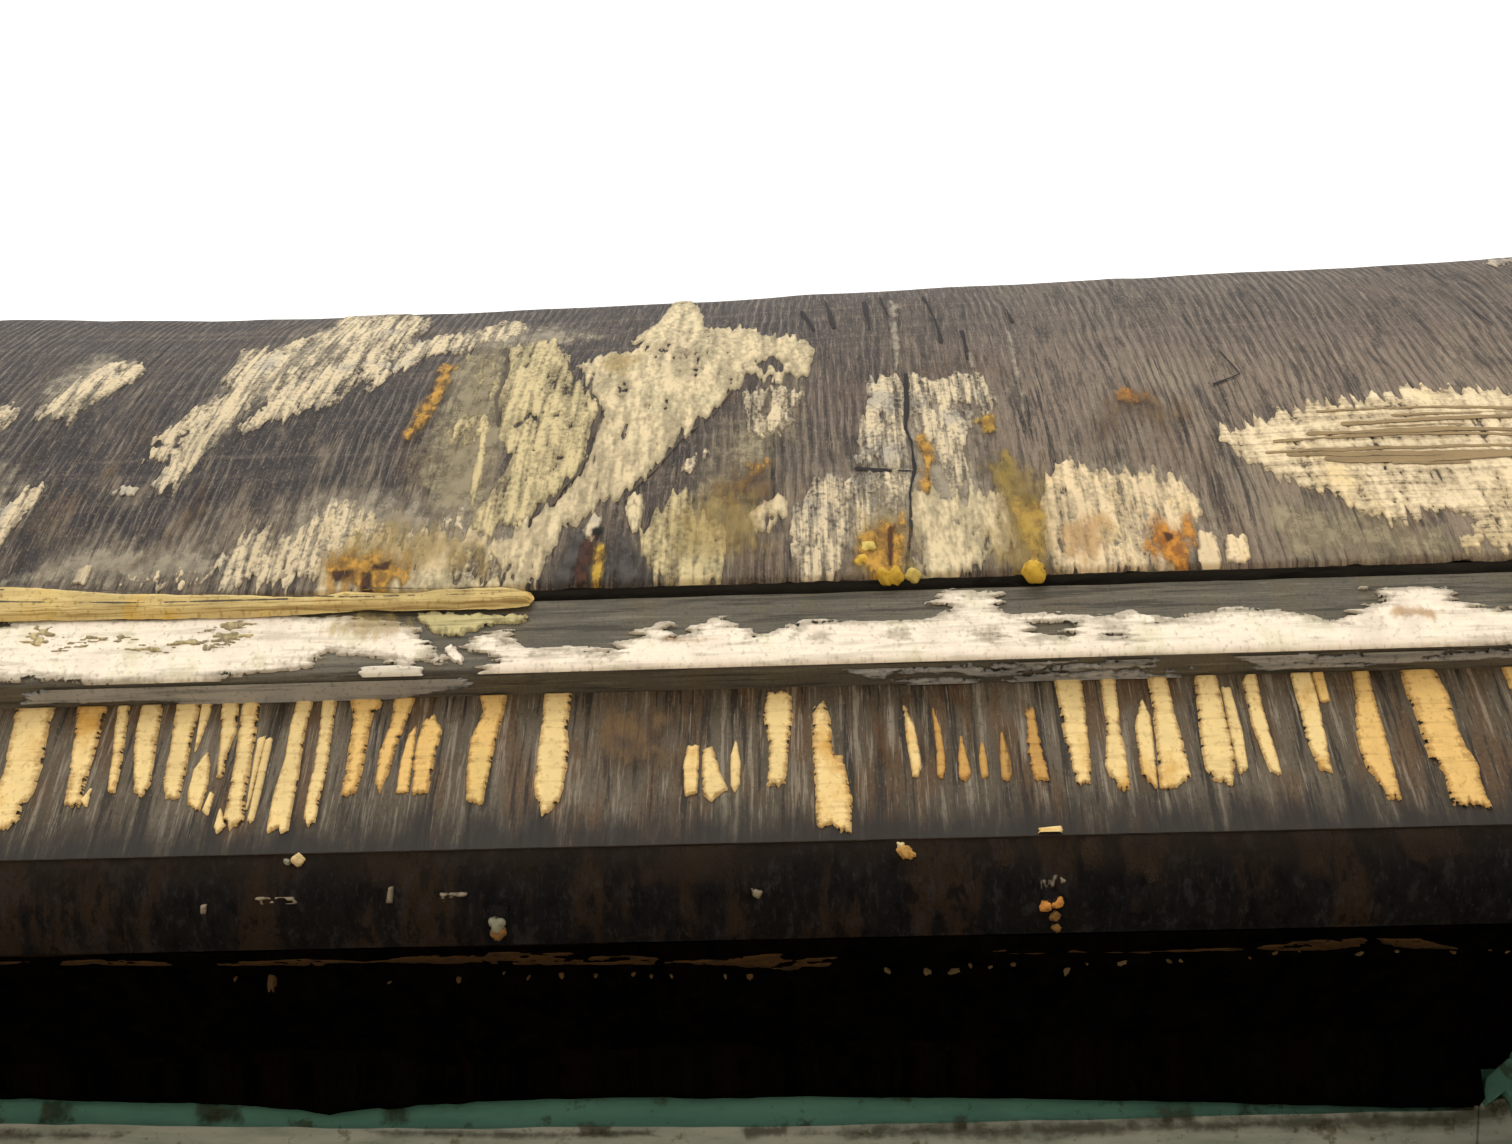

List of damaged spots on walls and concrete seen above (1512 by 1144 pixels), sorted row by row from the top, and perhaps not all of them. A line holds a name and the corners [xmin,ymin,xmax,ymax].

peeling [1482,258,1512,267]
corrosion [404,363,457,439]
crack [854,373,931,573]
corrosion [916,434,934,493]
corrosion [326,549,411,593]
peeling [0,296,1512,834]
corrosion [858,511,907,580]
corrosion [1145,514,1196,571]
spalling [896,842,916,860]